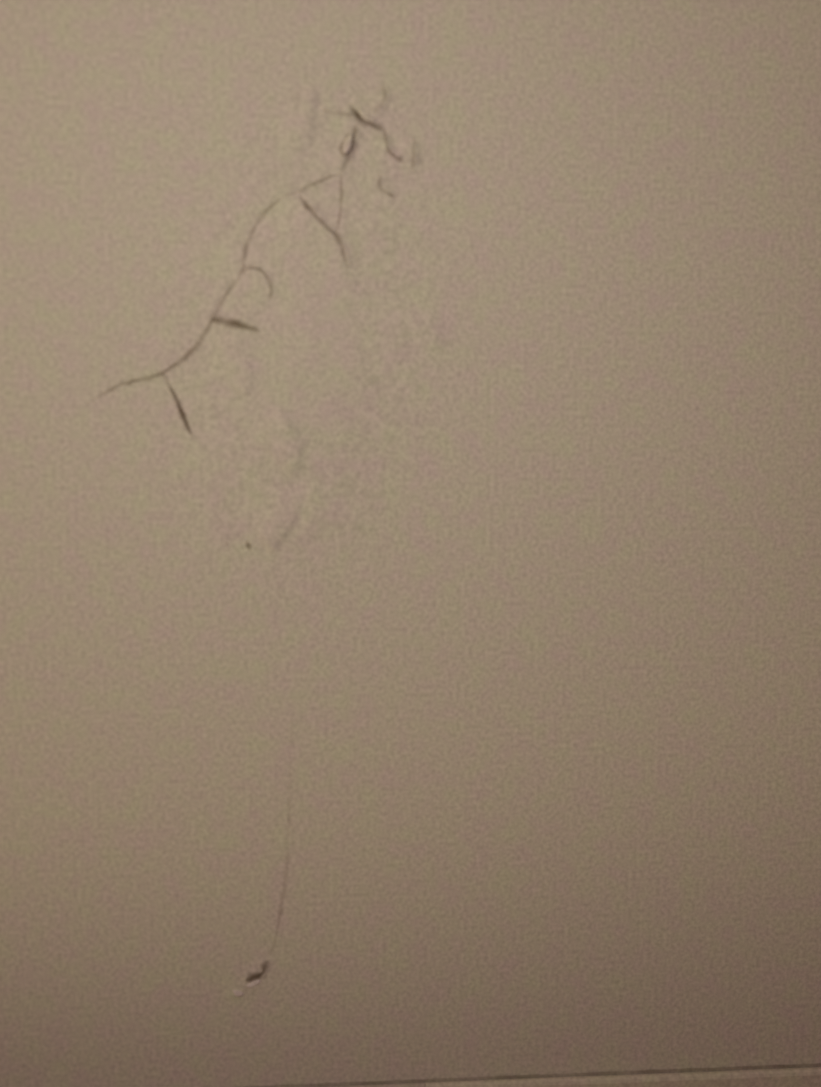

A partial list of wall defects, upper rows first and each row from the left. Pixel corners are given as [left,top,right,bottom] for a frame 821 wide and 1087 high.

crack [178,403,189,429]